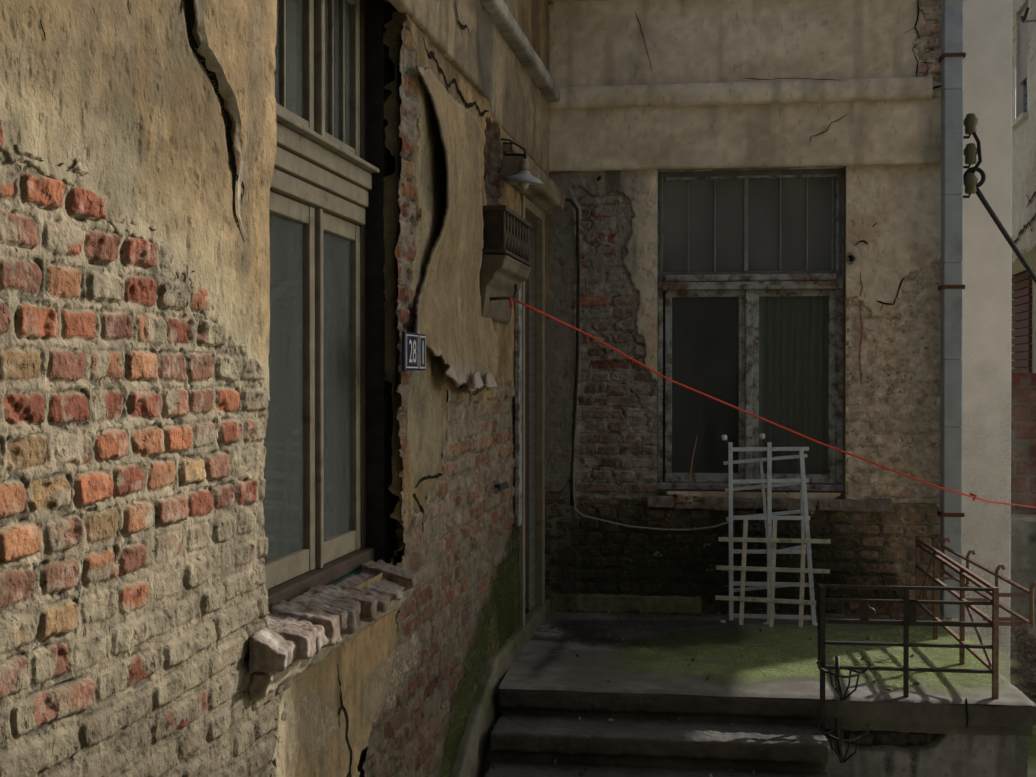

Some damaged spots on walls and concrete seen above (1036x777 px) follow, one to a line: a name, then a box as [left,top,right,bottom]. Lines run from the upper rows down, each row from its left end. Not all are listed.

crack [181,0,248,242]
crack [423,38,489,117]
flaking render [912,0,942,89]
crack [1014,191,1036,243]
flaking render [0,120,290,777]
flaking render [545,187,952,620]
crack [337,664,353,777]